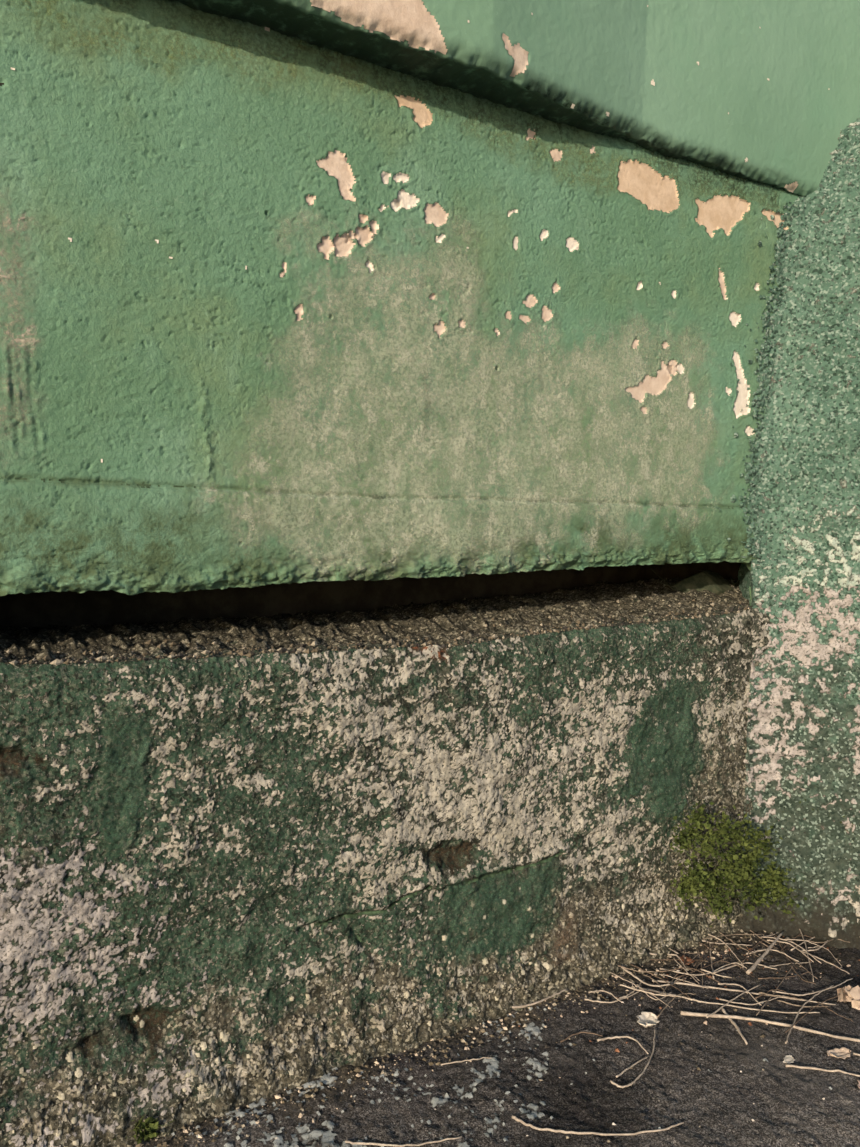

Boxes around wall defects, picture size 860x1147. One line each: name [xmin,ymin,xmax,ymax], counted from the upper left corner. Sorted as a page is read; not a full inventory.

peeling [310,0,448,55]
peeling [316,150,356,201]
peeling [317,172,449,273]
peeling [617,159,680,213]
peeling [695,194,789,238]
peeling [625,342,685,414]
peeling [725,351,767,436]
crack [466,853,562,885]
crack [315,885,431,942]
water stain [588,876,750,971]
water stain [143,905,600,1122]
water stain [18,1059,122,1147]